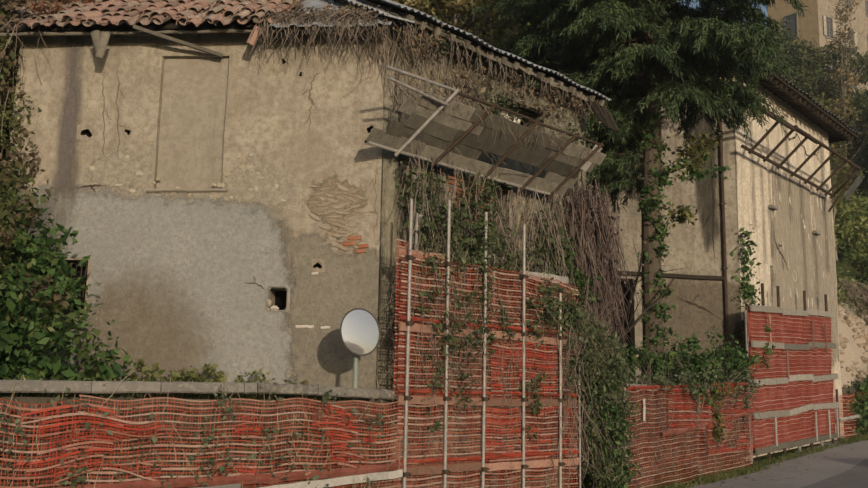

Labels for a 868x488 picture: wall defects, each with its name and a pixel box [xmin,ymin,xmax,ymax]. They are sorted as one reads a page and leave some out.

water stain [55,36,80,192]
crack [94,64,129,163]
crack [302,73,319,129]
crack [73,183,132,191]
peeling [89,126,294,211]
spalling [307,175,369,255]
spalling [311,258,325,275]